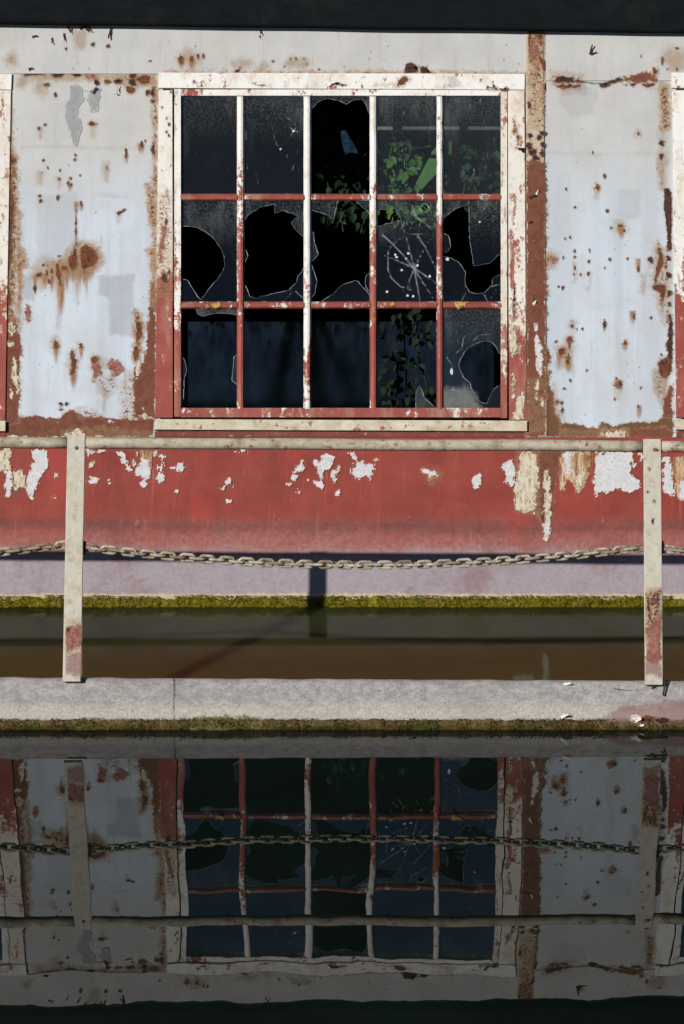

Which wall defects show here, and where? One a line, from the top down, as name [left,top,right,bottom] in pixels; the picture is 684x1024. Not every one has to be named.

peeling [64,84,101,147]
corrosion [24,46,329,306]
corrosion [7,128,101,324]
corrosion [525,31,678,422]
peeling [0,448,58,500]
peeling [86,449,186,488]
peeling [285,451,378,496]
peeling [501,451,643,542]
corrosion [65,625,82,675]
corrosion [645,589,661,677]